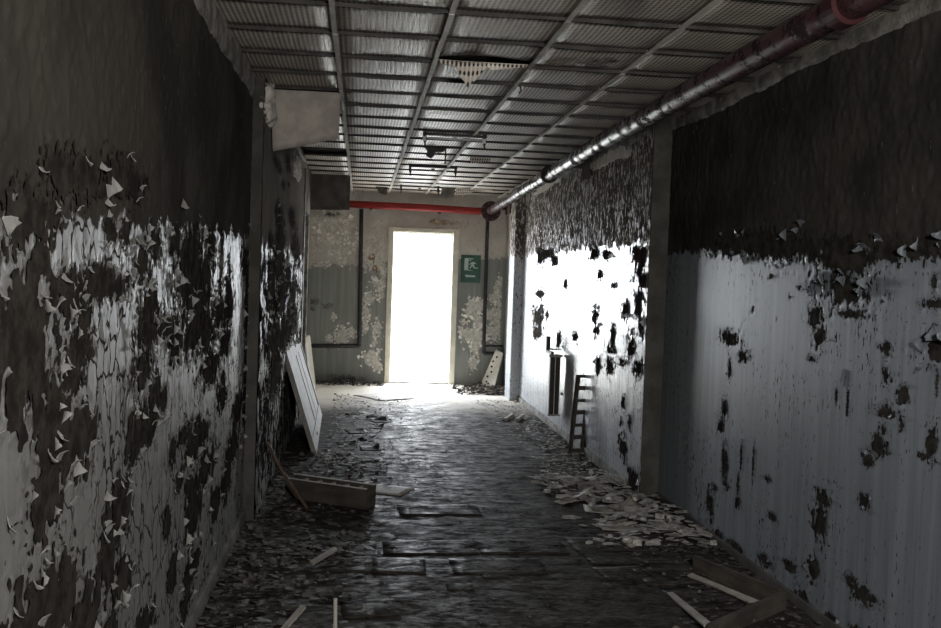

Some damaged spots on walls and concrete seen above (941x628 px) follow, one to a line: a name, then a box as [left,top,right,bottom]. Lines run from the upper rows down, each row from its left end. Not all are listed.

peeling [0,137,249,628]
crack [123,330,141,442]
peeling [260,151,387,405]
peeling [529,287,548,343]
peeling [532,247,561,268]
peeling [555,328,578,354]
peeling [587,235,649,386]
peeling [687,219,941,406]
peeling [858,336,910,470]
peeling [917,415,940,472]
peeling [707,438,836,603]
peeling [843,569,885,615]